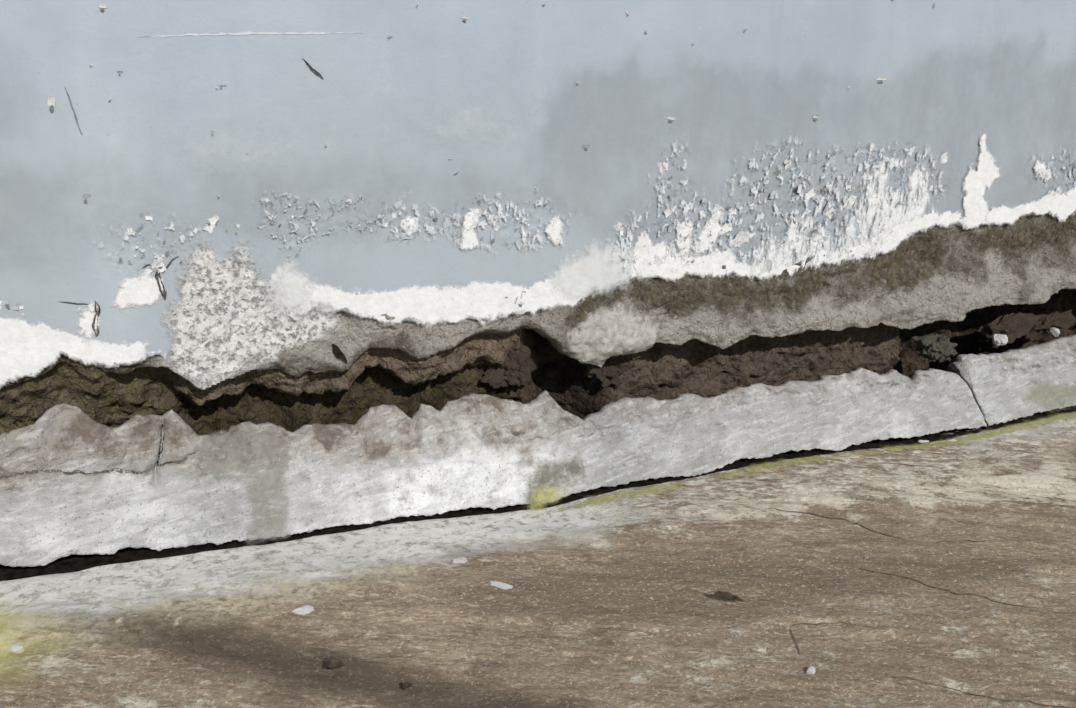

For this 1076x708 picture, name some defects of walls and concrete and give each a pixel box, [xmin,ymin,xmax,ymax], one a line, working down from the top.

crack [141,256,179,300]
spalling [0,134,1076,390]
crack [0,289,1076,581]